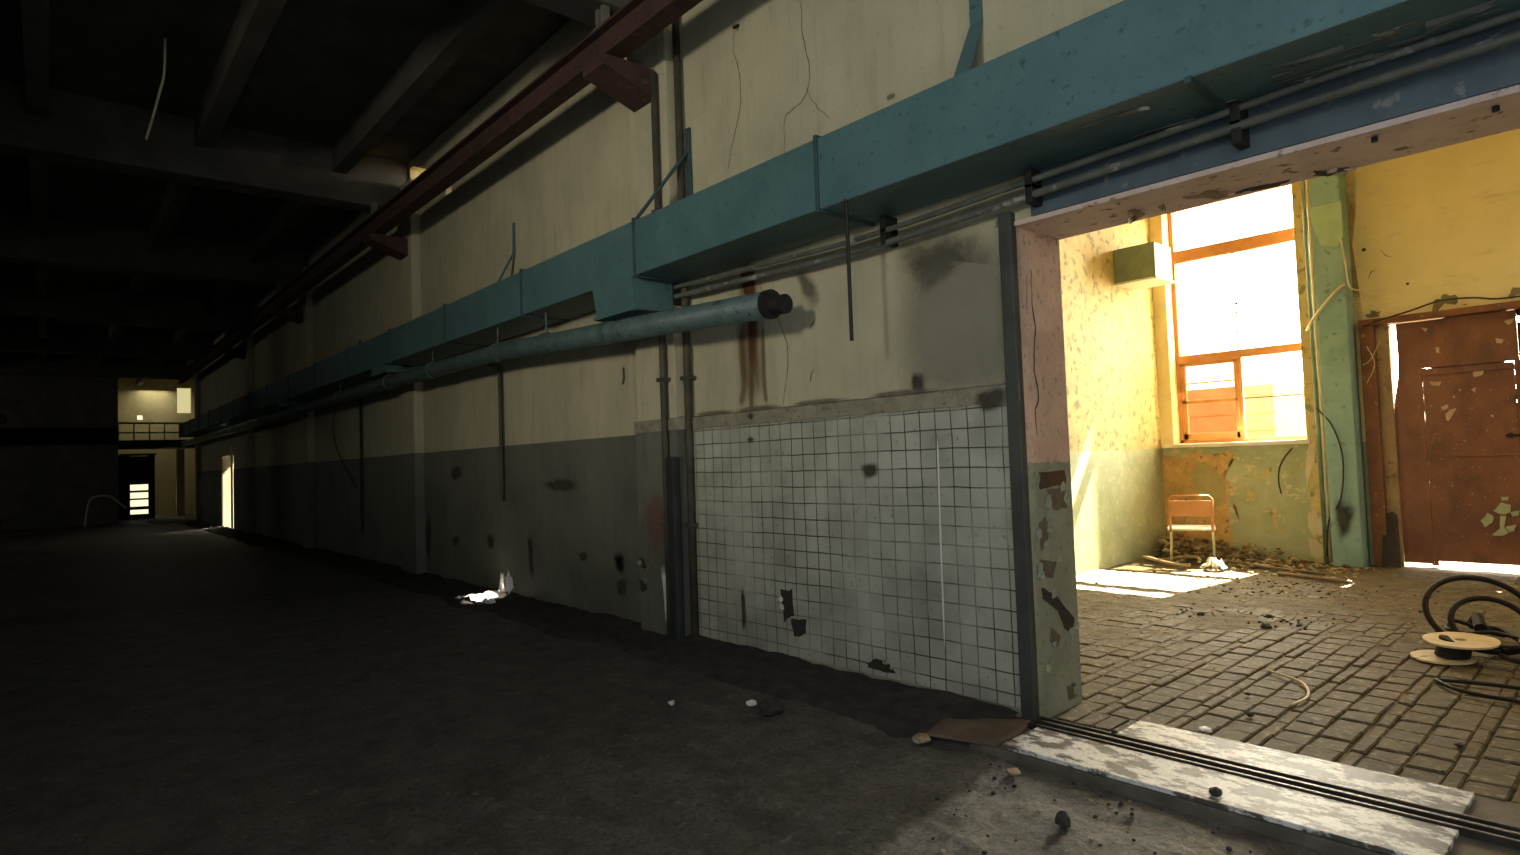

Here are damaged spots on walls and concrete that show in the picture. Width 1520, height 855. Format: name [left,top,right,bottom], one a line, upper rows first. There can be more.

crack [728,36,741,166]
crack [784,3,830,144]
corrosion [741,265,754,296]
leakage [912,241,970,284]
corrosion [740,321,767,407]
flaking render [1162,448,1282,551]
peeling [778,589,807,638]
peeling [1036,481,1080,673]
peeling [864,658,896,674]